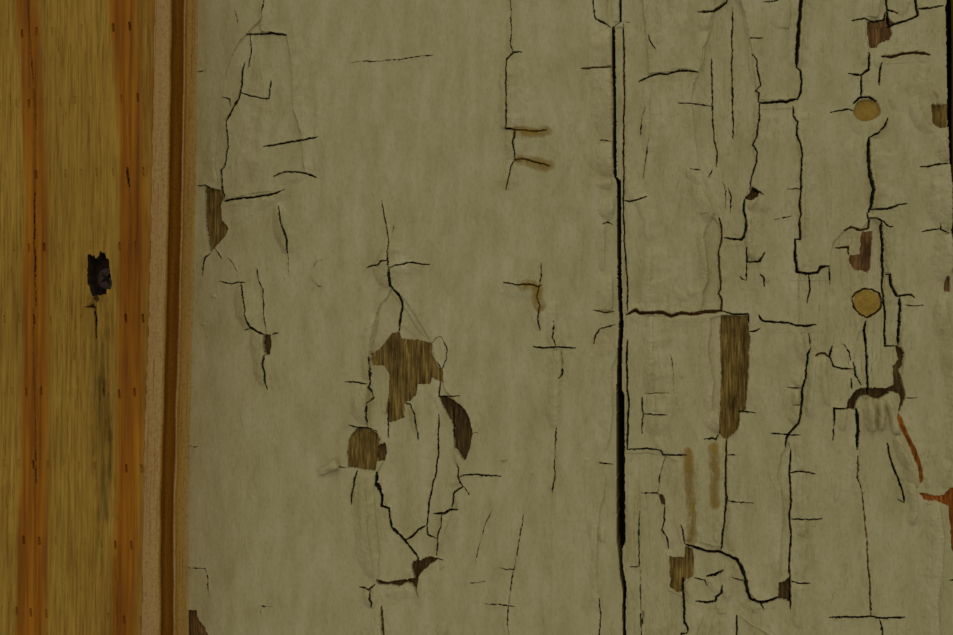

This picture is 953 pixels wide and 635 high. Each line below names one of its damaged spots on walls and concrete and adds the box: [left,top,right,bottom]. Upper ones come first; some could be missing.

crack [639,62,698,82]
peeling [848,0,943,97]
peeling [200,0,327,274]
peeling [908,89,950,163]
peeling [222,267,278,389]
crack [626,302,721,327]
peeling [592,0,925,635]
peeling [340,204,500,609]
crack [628,436,686,456]
crack [830,456,905,635]
peeling [189,610,208,635]
crack [735,610,802,635]